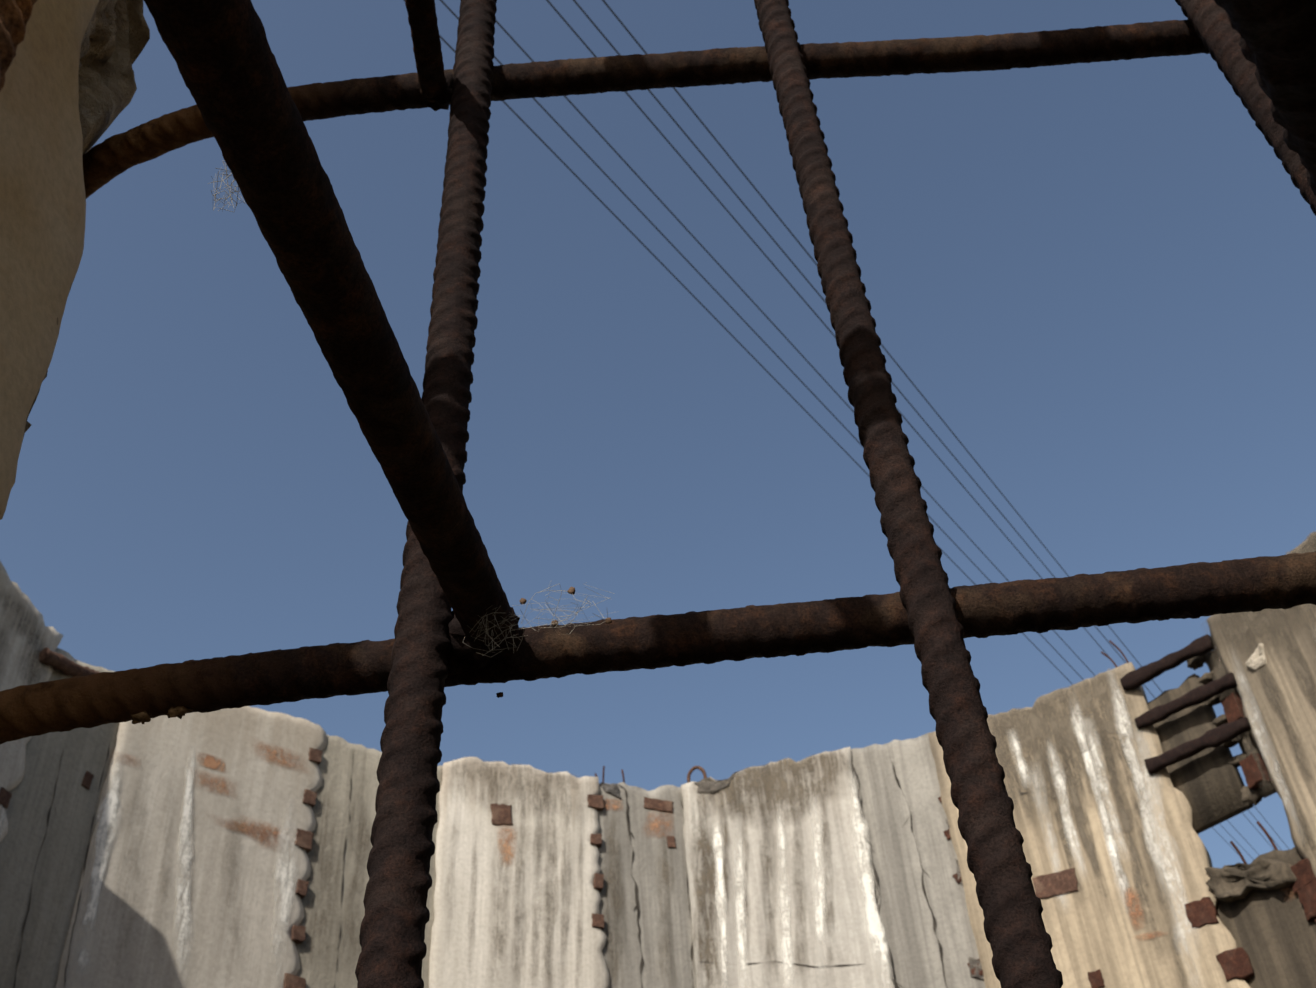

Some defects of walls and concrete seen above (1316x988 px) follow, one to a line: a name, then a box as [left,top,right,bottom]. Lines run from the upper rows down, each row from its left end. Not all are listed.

spalling [0,0,38,92]
spalling [23,370,48,438]
spalling [78,0,520,646]
spalling [445,0,1316,988]
leakage [83,763,120,929]
leakage [176,761,193,961]
rust [200,755,228,793]
spalling [0,521,454,988]
leakage [273,820,331,953]
leakage [693,752,845,987]
leakage [852,787,890,985]